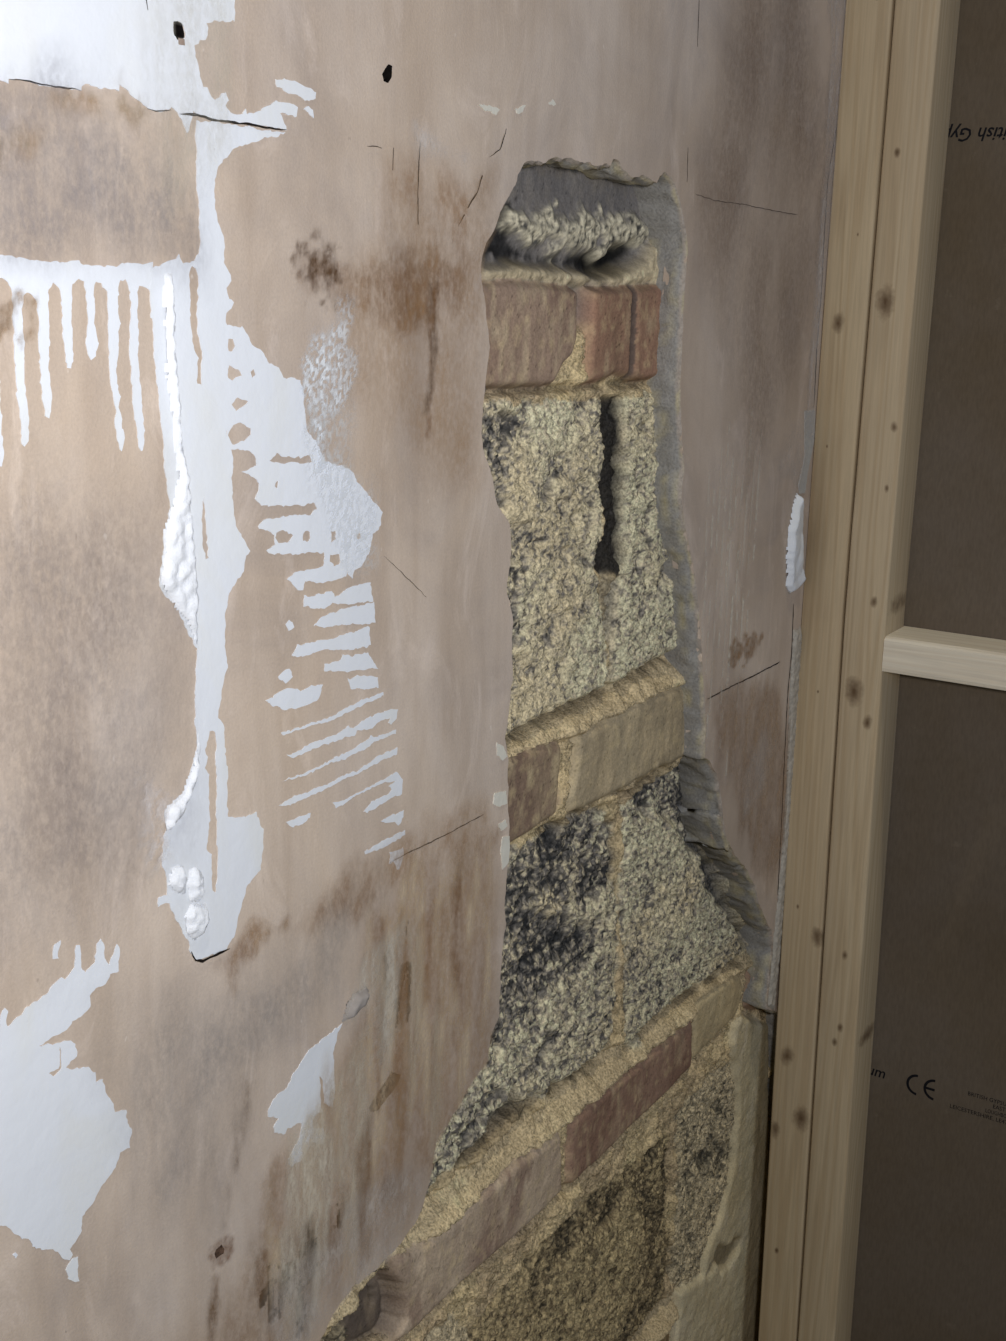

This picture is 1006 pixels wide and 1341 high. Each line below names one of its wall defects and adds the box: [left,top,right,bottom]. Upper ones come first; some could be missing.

peeling [0,0,405,960]
spalling [320,157,802,1341]
peeling [0,939,132,1282]
peeling [268,965,395,1166]
leakage [269,862,492,1341]